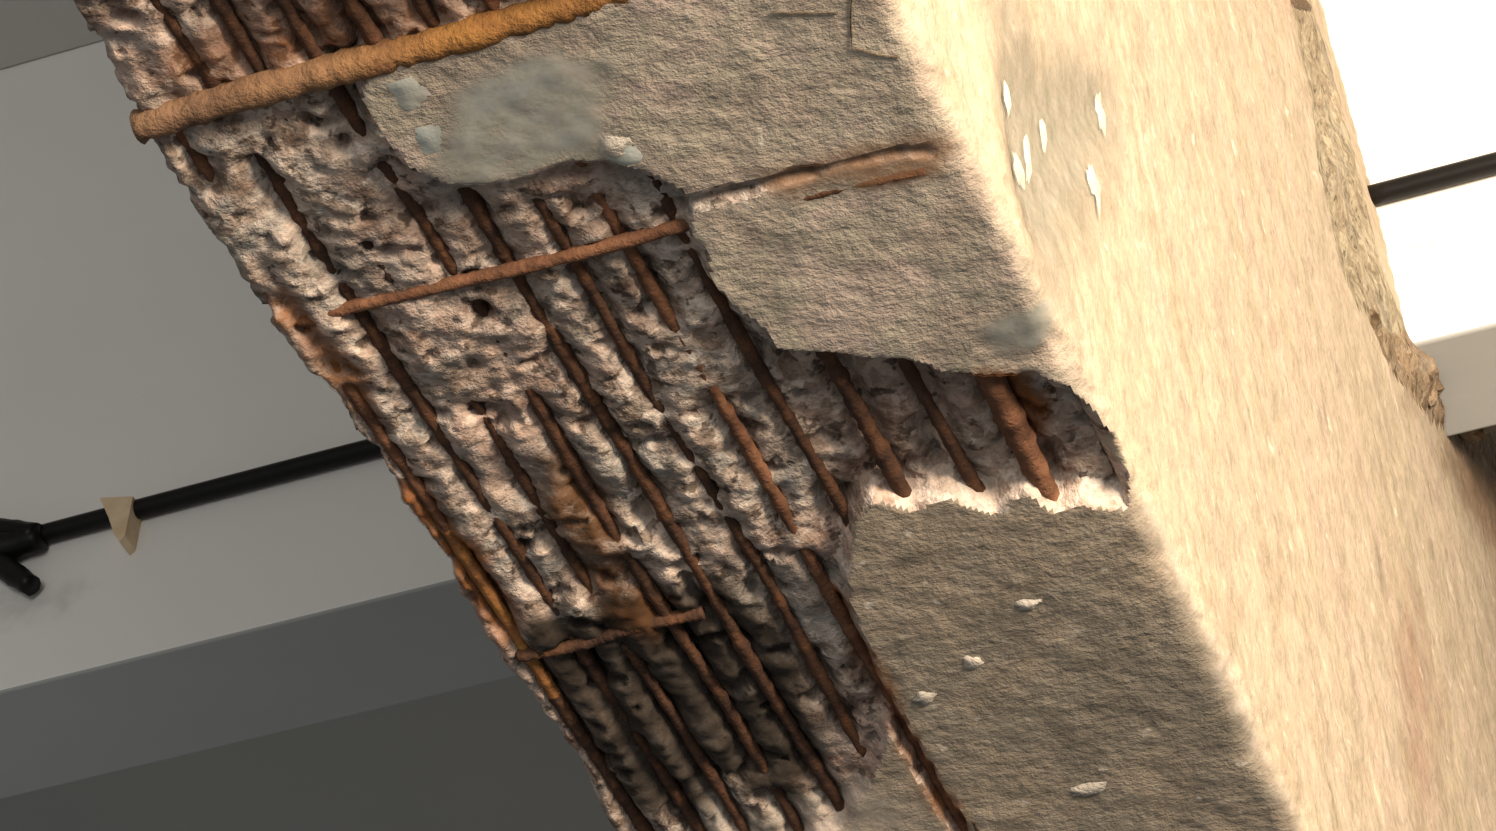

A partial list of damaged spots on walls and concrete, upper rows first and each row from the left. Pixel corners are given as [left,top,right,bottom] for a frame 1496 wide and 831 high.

spalling [74,0,529,111]
spalling [1292,0,1496,473]
spalling [154,54,1131,831]
rust [990,373,1046,427]
rust [401,485,512,623]
rust [546,462,669,627]
damp [526,575,820,815]